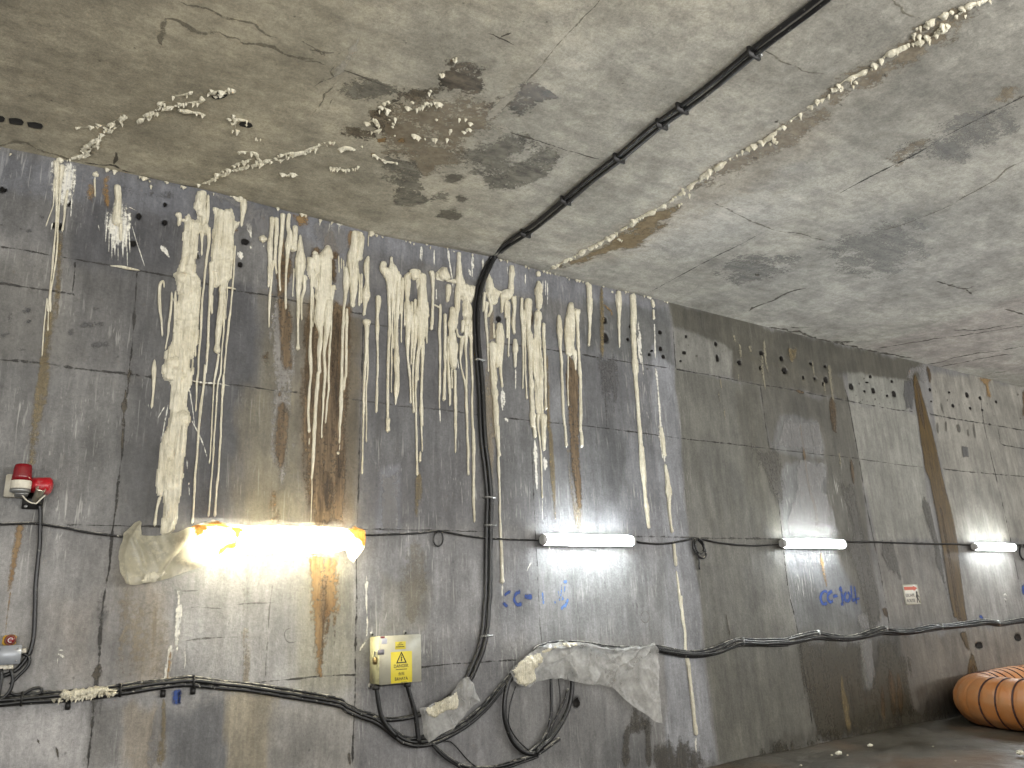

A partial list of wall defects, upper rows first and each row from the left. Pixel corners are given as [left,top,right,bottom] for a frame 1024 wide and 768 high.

crack [157,2,408,106]
damp [41,88,236,357]
corrosion [264,239,352,526]
corrosion [309,554,340,677]
corrosion [312,231,352,283]
damp [148,0,992,596]
corrosion [566,356,582,509]
corrosion [913,366,978,674]